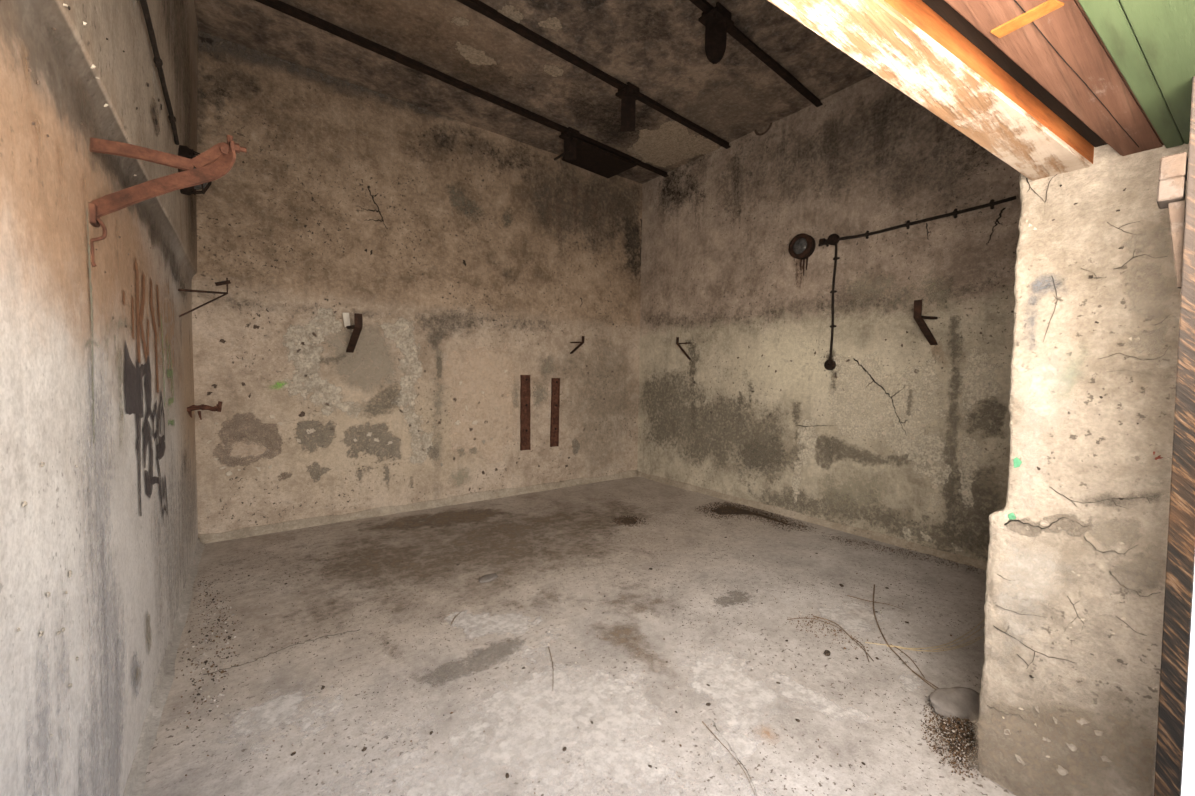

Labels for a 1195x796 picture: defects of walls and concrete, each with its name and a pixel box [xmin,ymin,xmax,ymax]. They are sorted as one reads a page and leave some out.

peeling [188,308,493,488]
damp [642,317,1007,560]
crack [853,358,908,436]
crack [1050,487,1163,508]
crack [994,574,1084,668]